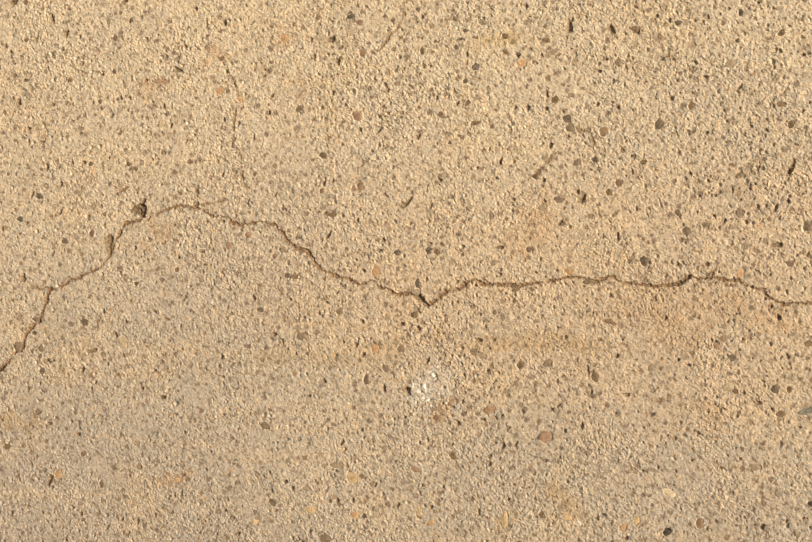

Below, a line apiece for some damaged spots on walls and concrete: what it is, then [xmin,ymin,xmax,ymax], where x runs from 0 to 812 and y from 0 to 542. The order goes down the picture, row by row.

crack [1,189,812,367]